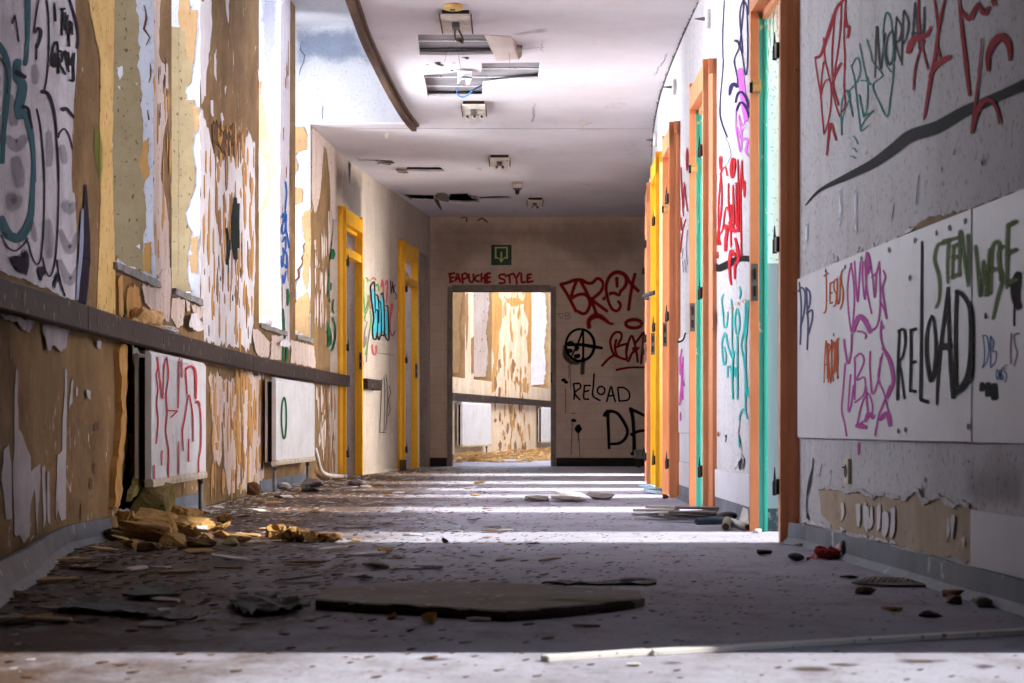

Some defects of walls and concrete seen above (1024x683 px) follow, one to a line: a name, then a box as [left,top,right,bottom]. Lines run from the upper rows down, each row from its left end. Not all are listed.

peeling [88,0,336,368]
peeling [0,313,70,352]
peeling [1,368,91,543]
peeling [204,368,412,544]
peeling [453,292,547,455]
peeling [801,485,977,564]